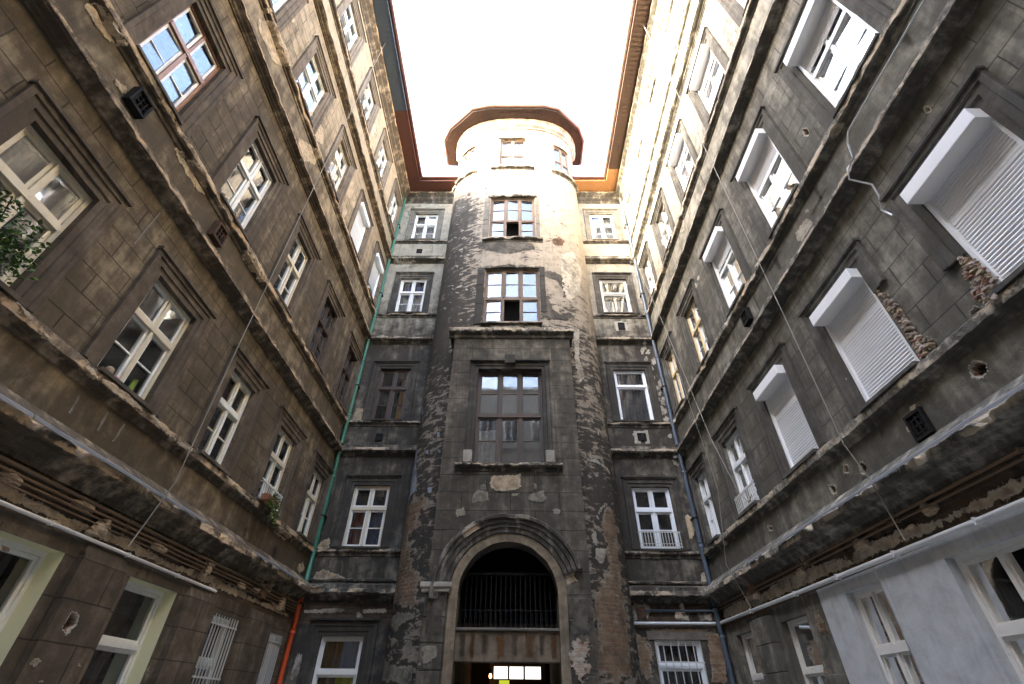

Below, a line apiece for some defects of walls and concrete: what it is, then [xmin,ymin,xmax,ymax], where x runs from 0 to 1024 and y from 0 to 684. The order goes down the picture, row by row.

flaking render [84,1,129,47]
spalling [957,256,999,320]
flaking render [542,252,601,410]
spalling [876,290,936,359]
hole [960,351,997,388]
flaking render [633,430,650,444]
flaking render [226,475,256,505]
flaking render [456,474,561,518]
flaking render [0,482,289,617]
flaking render [723,476,1024,619]
hole [54,607,86,640]
flaking render [382,642,437,683]